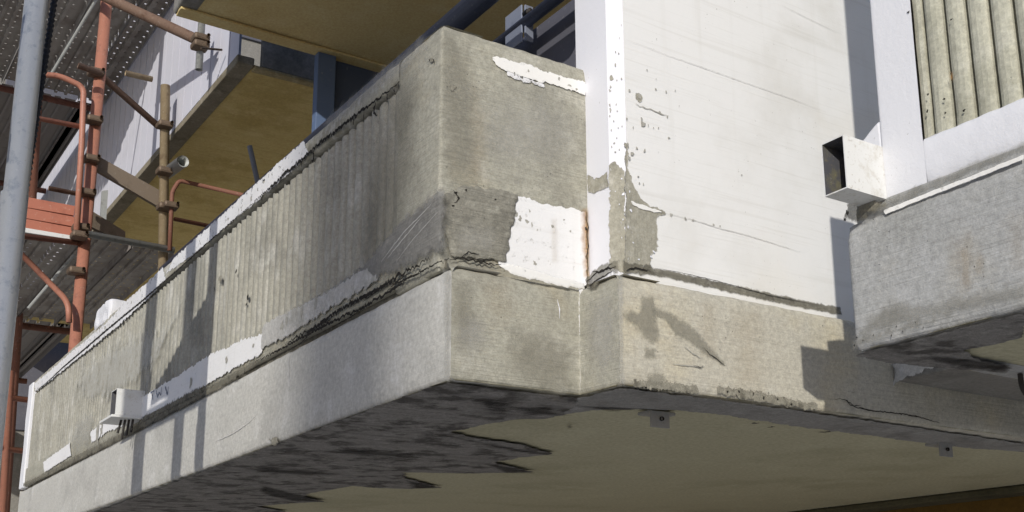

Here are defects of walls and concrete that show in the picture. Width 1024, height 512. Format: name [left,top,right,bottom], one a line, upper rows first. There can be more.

peeling [492,56,586,95]
peeling [587,103,670,272]
crack [36,83,400,391]
peeling [498,196,587,286]
crack [256,251,501,383]
crack [557,264,815,332]
peeling [141,334,262,417]
peeling [43,442,71,472]
peeling [90,423,118,445]
crack [835,399,939,423]
water stain [263,488,318,502]